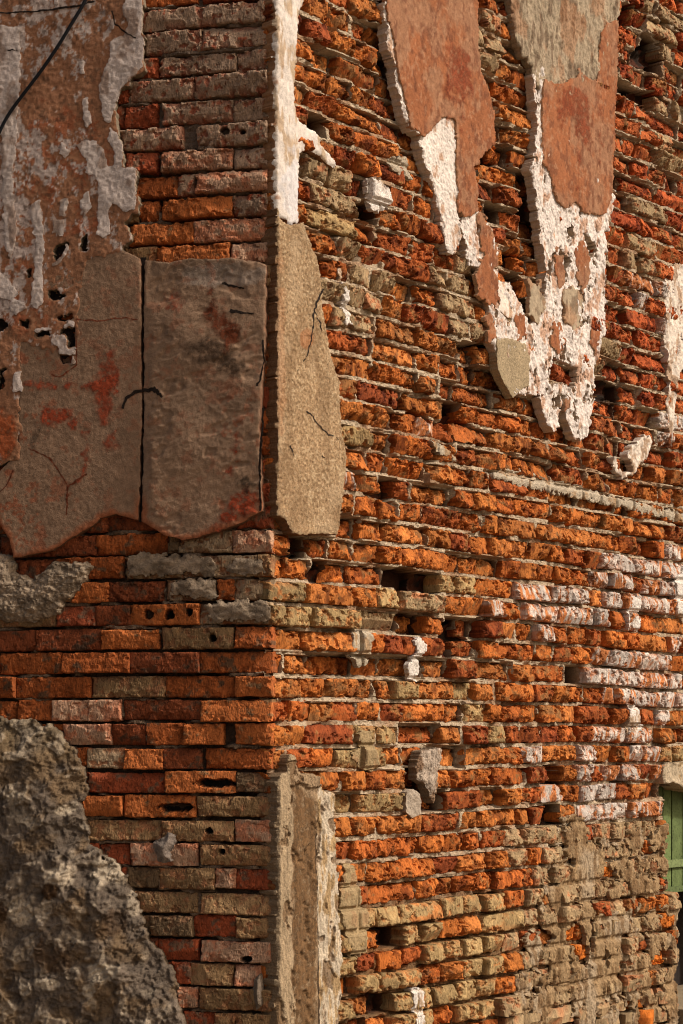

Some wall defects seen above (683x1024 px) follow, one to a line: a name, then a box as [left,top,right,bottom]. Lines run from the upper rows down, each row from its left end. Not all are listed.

peeling [0,0,145,365]
crack [51,257,163,522]
crack [298,289,324,370]
crack [306,411,339,458]
peeling [375,0,652,442]